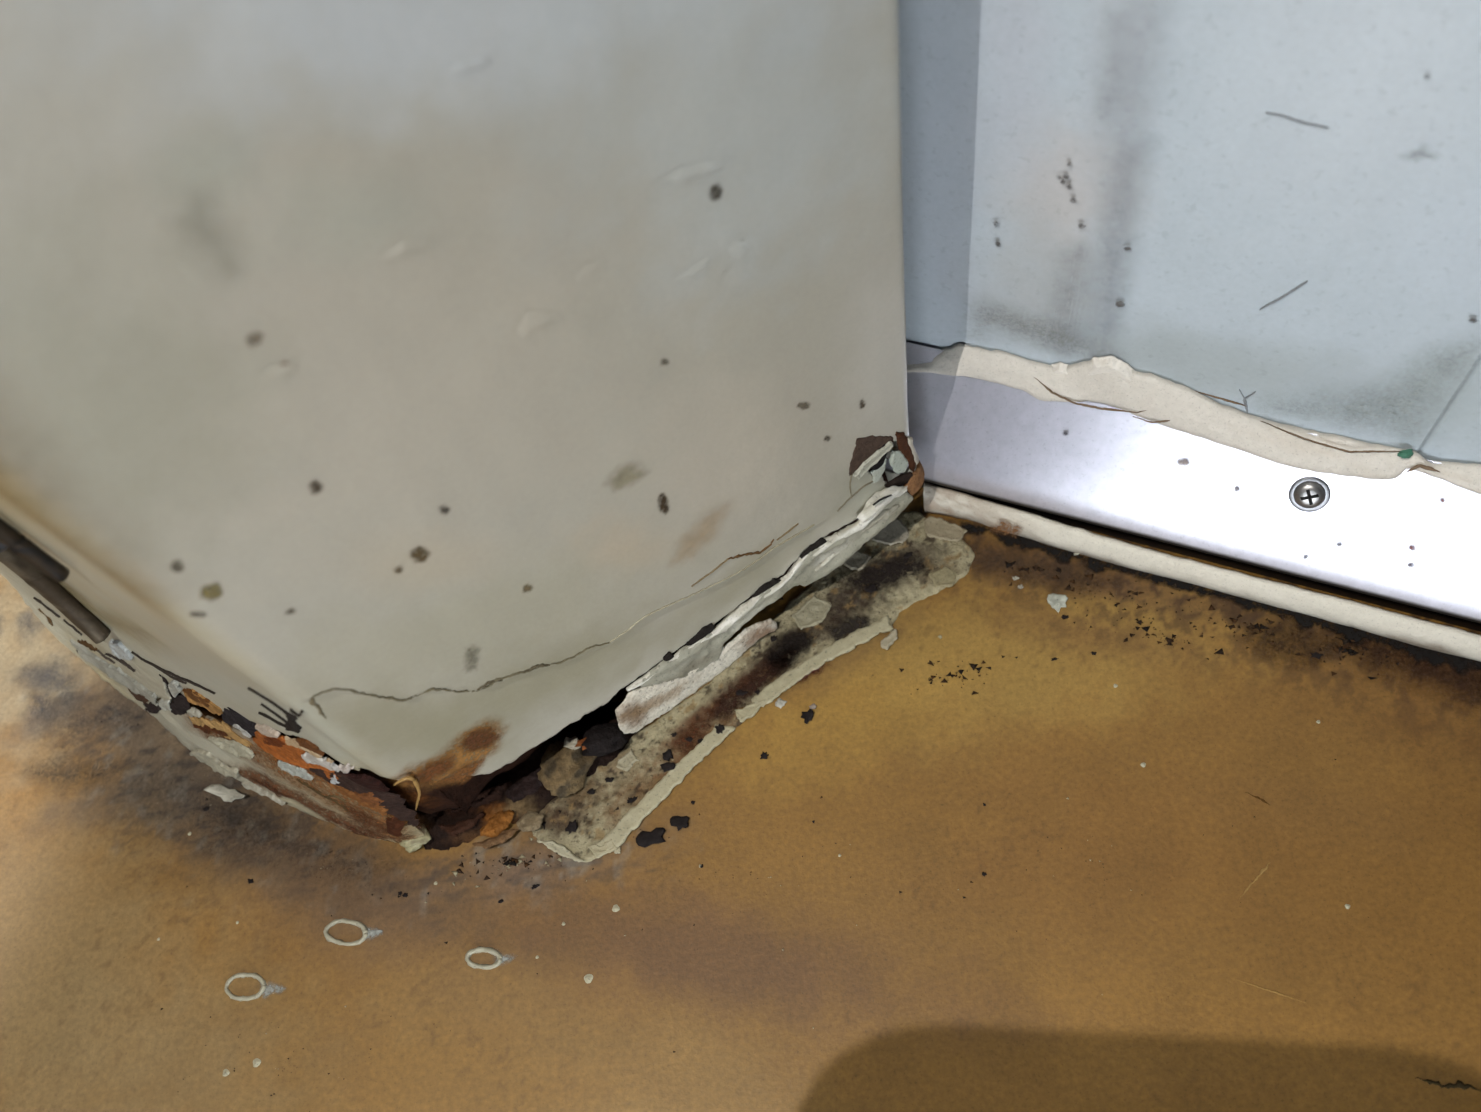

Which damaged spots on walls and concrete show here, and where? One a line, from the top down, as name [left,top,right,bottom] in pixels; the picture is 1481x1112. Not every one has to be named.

rust [128,689,149,704]
peeling [70,639,288,806]
peeling [277,760,339,784]
rust [187,644,690,842]
crack [33,474,873,733]
peeling [532,437,975,862]